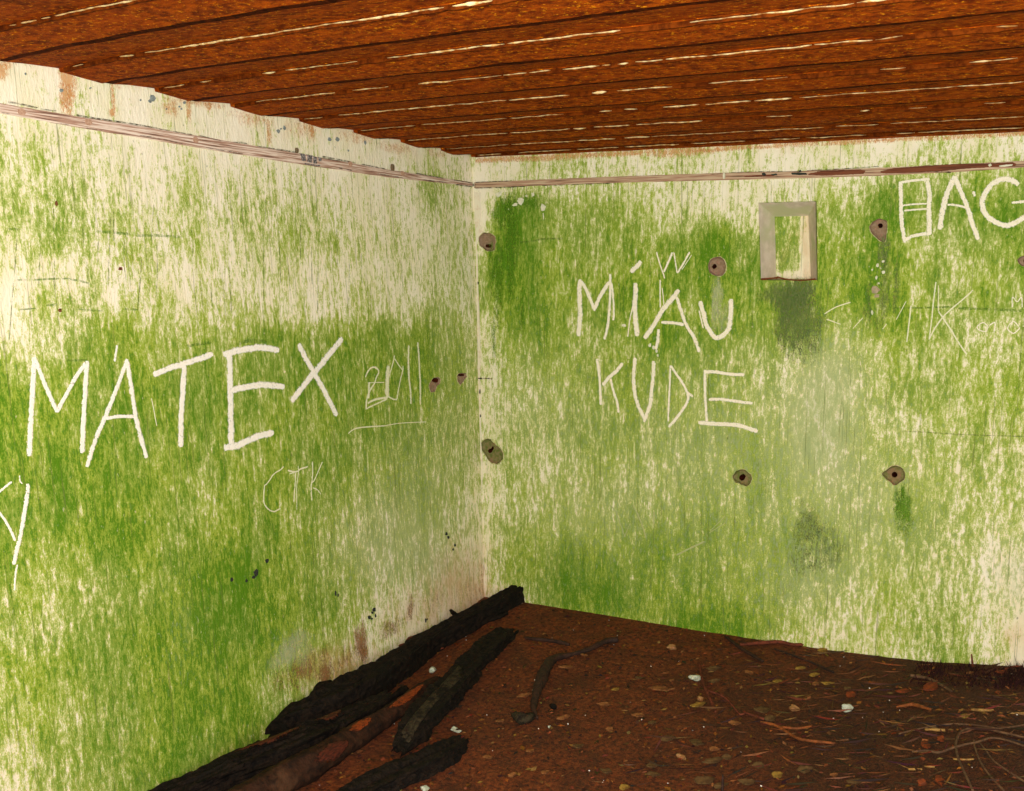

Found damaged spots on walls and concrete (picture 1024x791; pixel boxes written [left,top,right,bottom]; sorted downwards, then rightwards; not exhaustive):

leakage [299,153,322,166]
leakage [895,487,913,531]